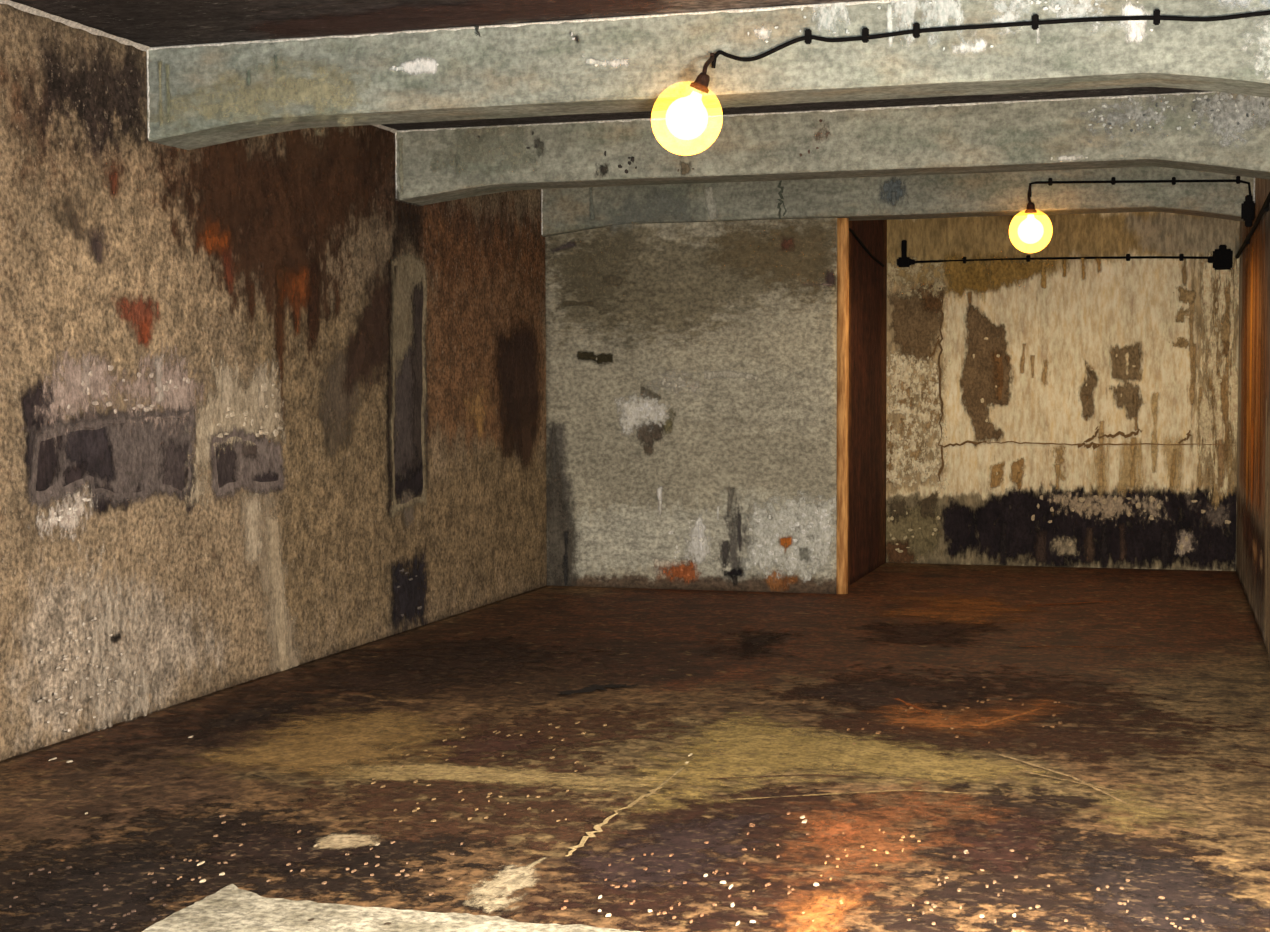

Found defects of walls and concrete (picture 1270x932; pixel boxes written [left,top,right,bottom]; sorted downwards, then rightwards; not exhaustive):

spalling [37,486,93,541]
corrosion [112,292,160,345]
peeling [35,347,286,507]
corrosion [200,223,234,293]
damp [151,0,686,527]
damp [465,316,577,586]
peeling [886,257,1048,563]
crack [929,288,1238,481]
spalling [1080,343,1146,431]